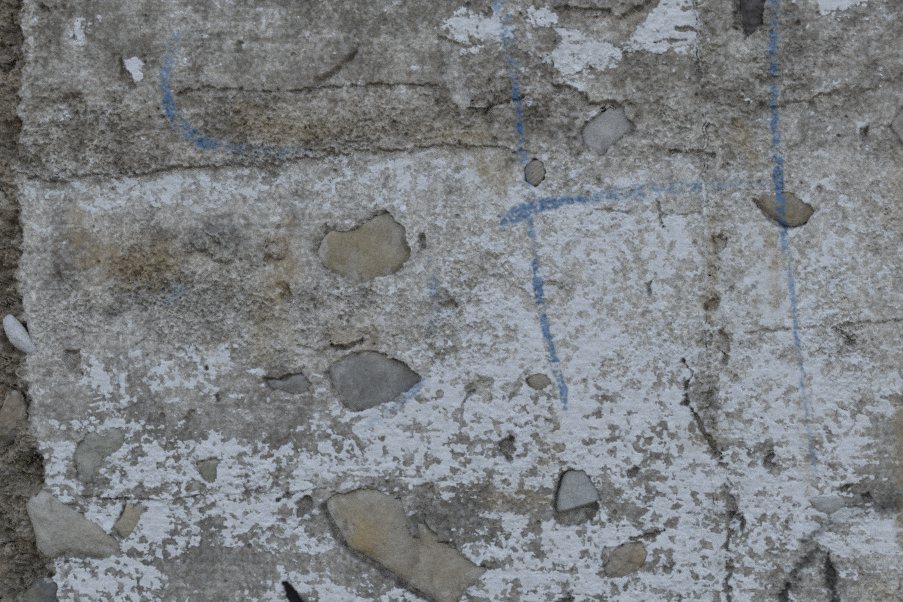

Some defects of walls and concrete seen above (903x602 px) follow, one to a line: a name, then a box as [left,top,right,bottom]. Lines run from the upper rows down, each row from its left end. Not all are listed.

spalling [0,0,517,602]
peeling [504,382,715,602]
crack [677,358,747,602]